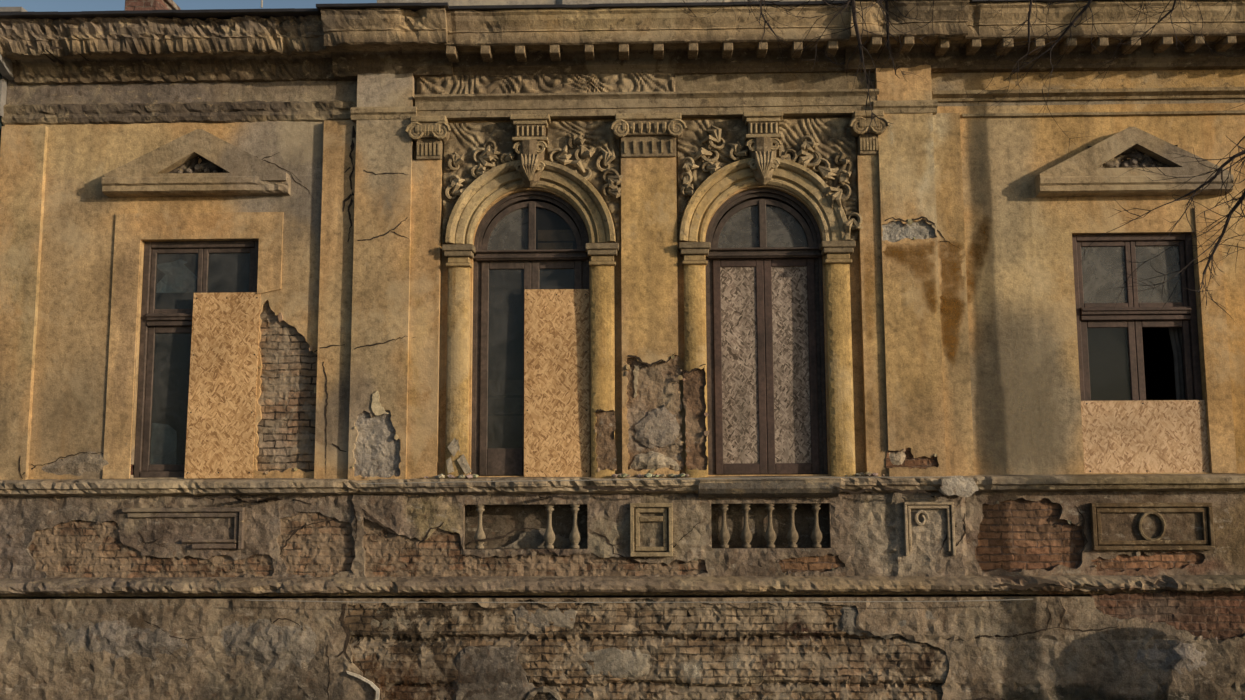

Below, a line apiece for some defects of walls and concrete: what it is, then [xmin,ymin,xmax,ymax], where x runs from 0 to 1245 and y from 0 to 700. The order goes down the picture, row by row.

crack [255,126,409,242]
flaking render [882,219,936,243]
flaking render [257,301,317,474]
flaking render [352,391,401,478]
flaking render [594,355,709,473]
flaking render [28,512,708,579]
flaking render [886,448,1204,572]
flaking render [343,598,949,700]
flaking render [1090,590,1245,640]